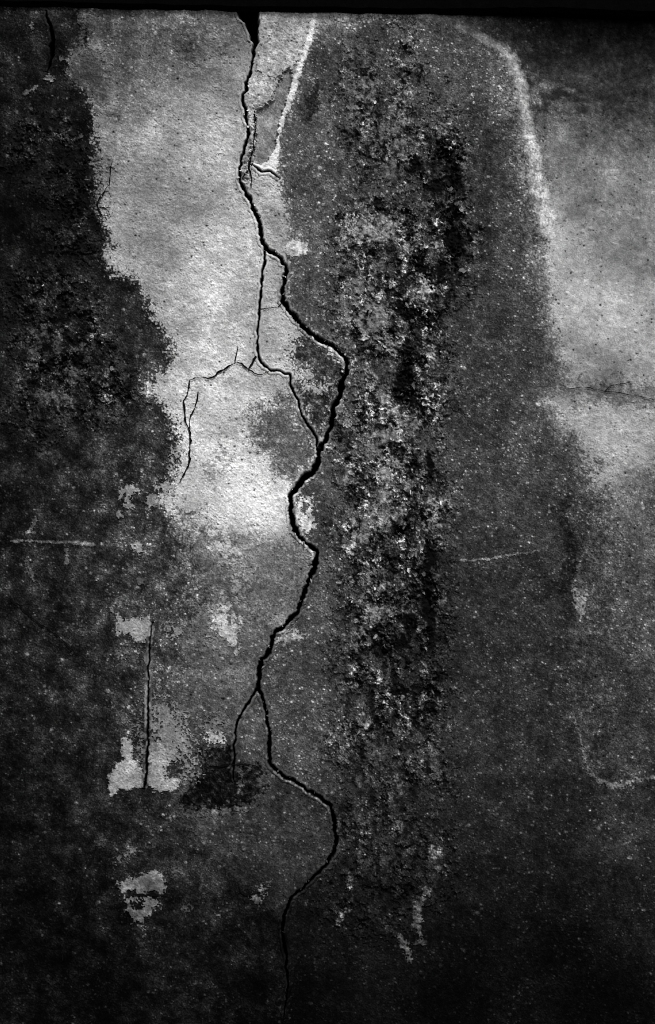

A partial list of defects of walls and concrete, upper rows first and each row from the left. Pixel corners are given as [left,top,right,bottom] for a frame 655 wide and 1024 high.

crack [43,10,58,72]
damp [140,21,238,67]
crack [179,12,352,1018]
damp [262,432,357,804]
crack [141,623,156,789]
peeling [106,686,233,797]
peeling [113,844,140,866]
peeling [115,856,183,930]